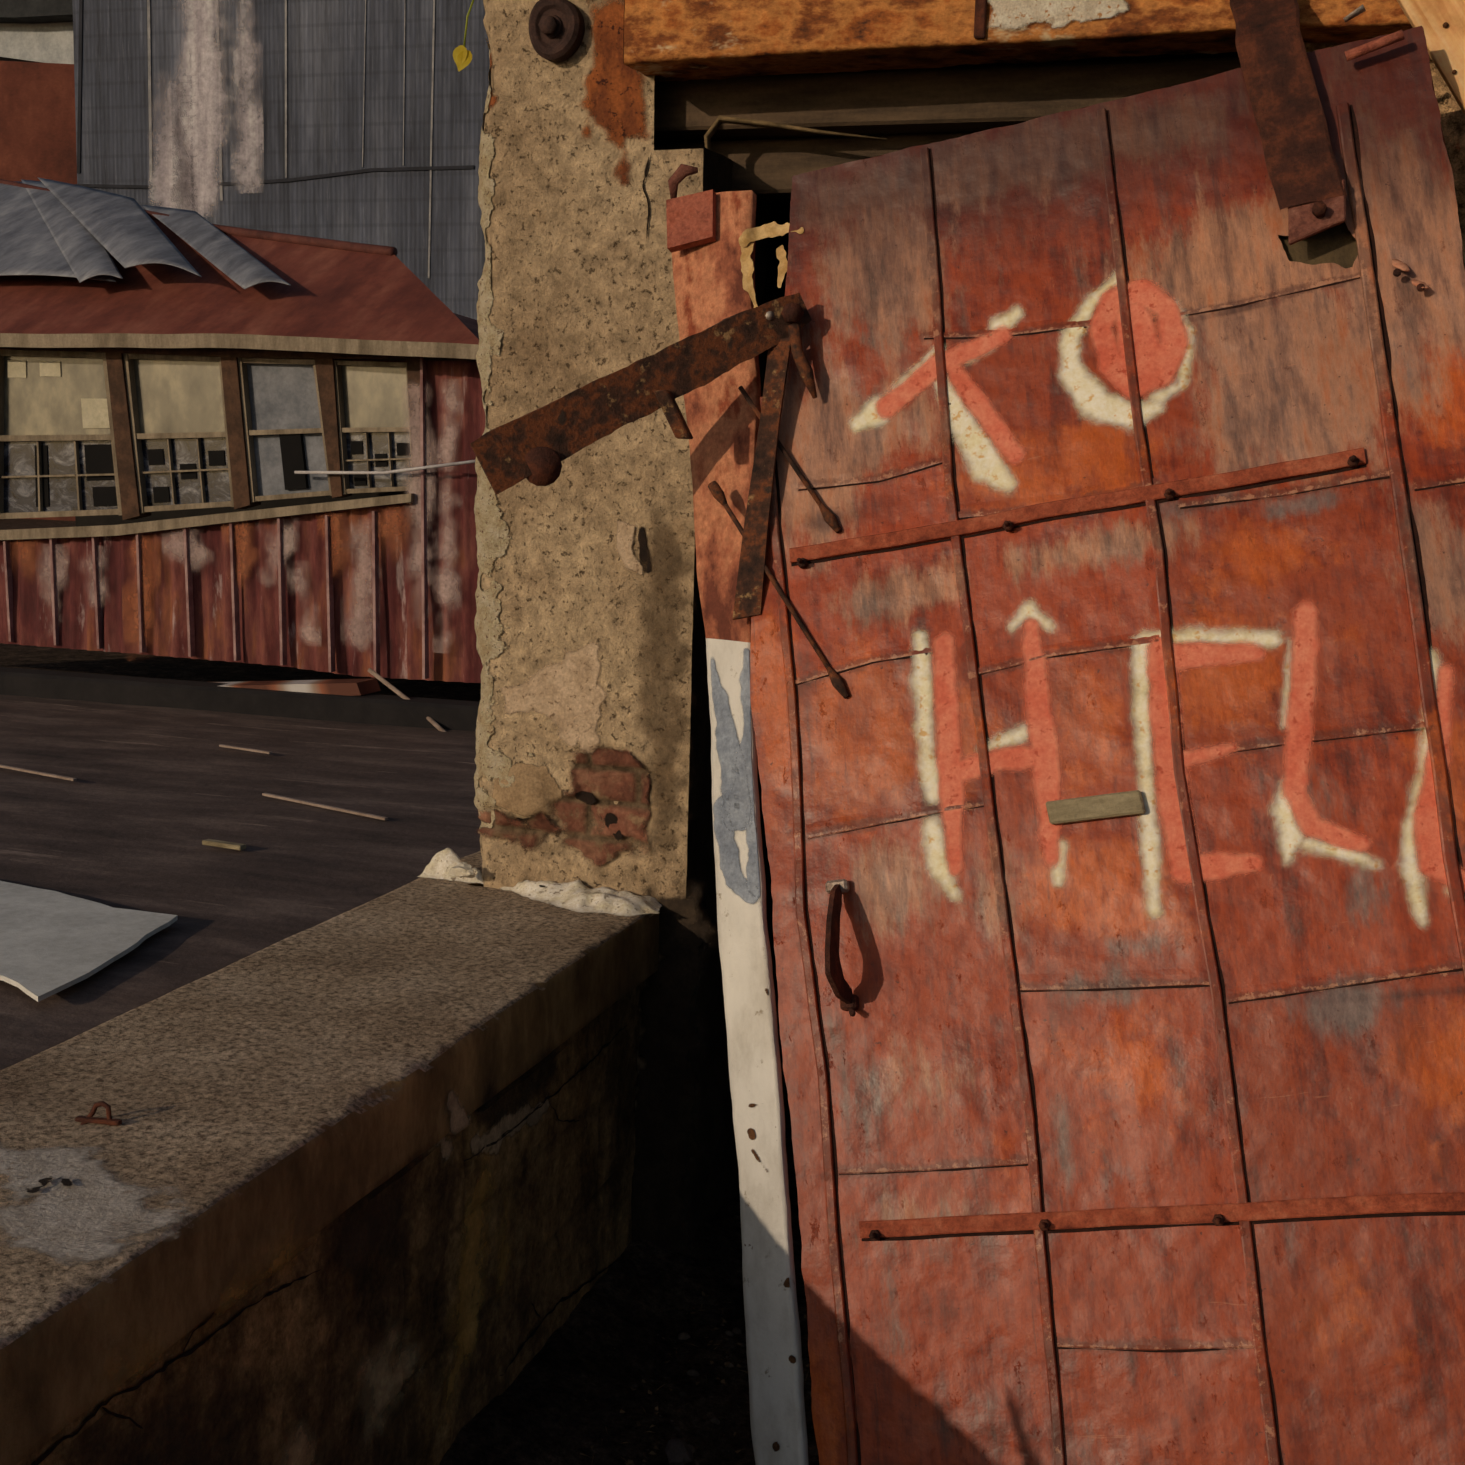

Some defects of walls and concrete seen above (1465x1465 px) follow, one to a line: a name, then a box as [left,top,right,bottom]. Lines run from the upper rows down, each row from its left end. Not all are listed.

leakage [154,0,263,215]
peeling [988,0,1128,29]
peeling [476,32,504,435]
spalling [474,457,651,866]
crack [34,1269,321,1465]
leakage [334,1154,428,1272]
leakage [447,1169,509,1399]